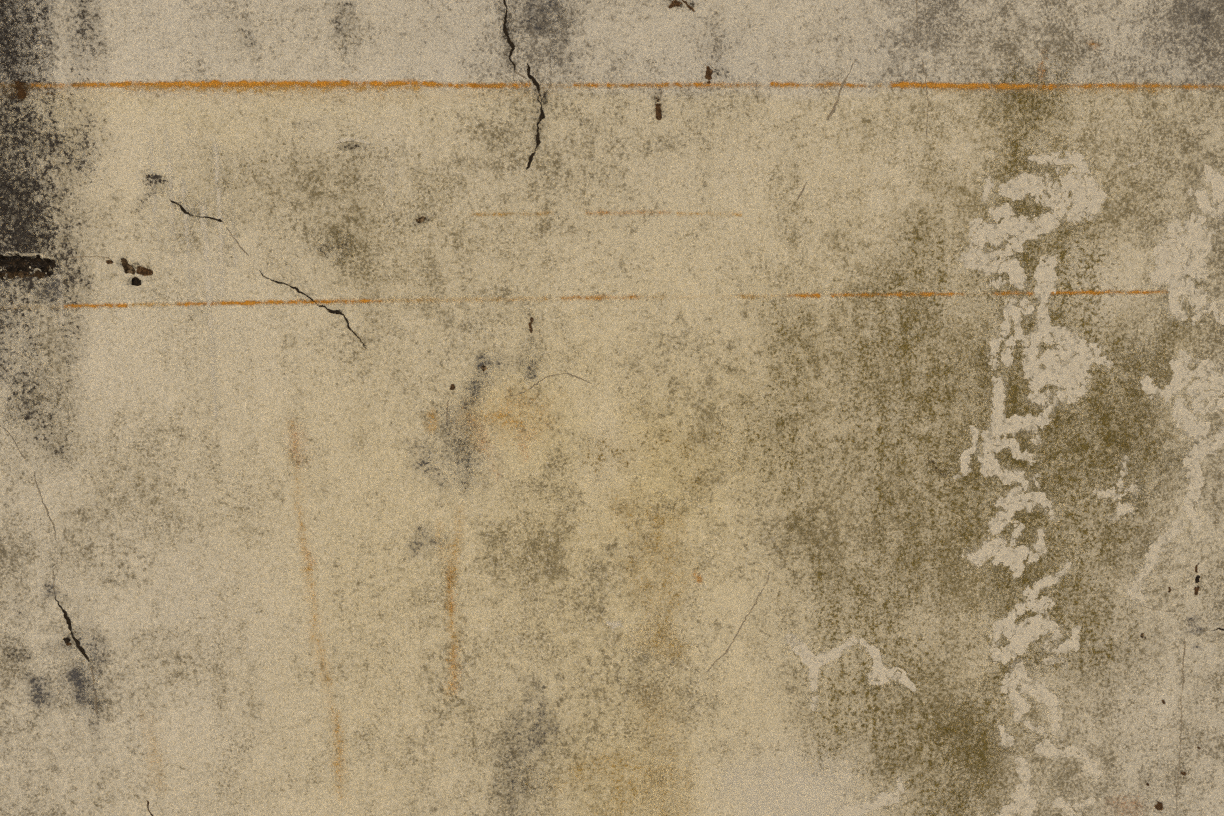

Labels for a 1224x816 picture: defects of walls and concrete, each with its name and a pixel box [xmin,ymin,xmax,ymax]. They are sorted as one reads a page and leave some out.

rust [2,80,530,99]
crack [500,0,548,170]
rust [770,63,1221,92]
spalling [0,253,66,314]
leakage [0,0,106,463]
rust [65,299,381,308]
crack [170,200,368,350]
peeling [1148,164,1224,326]
peeling [953,149,1114,816]
peeling [1092,455,1139,521]
peeling [1126,350,1224,605]
peeling [785,634,916,711]